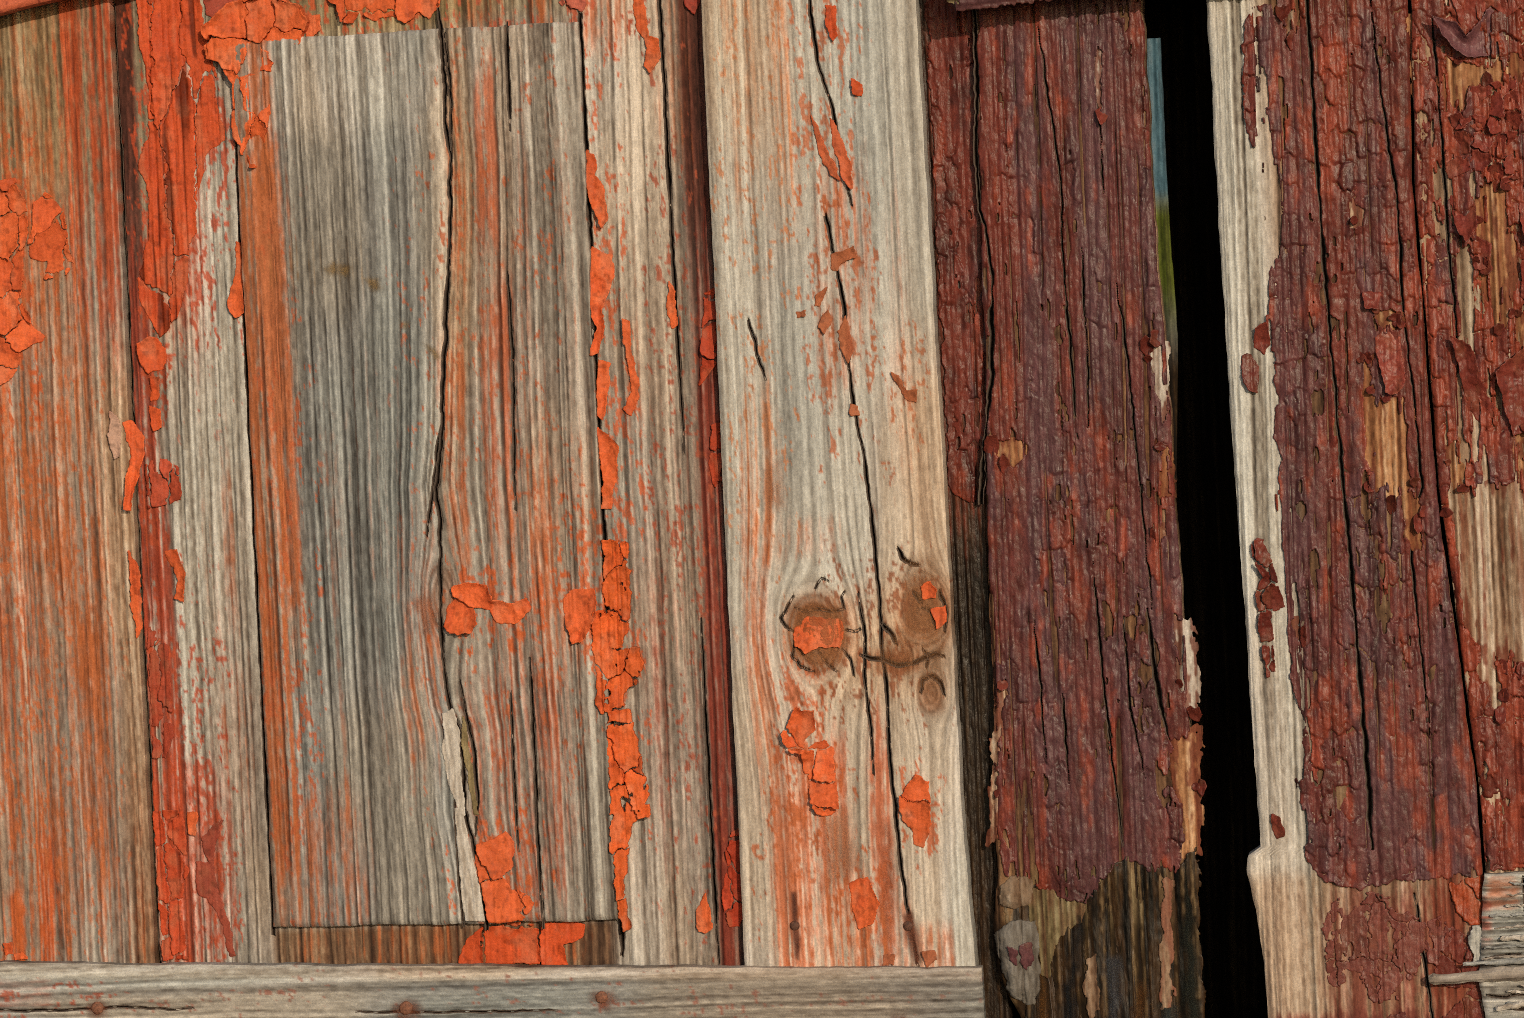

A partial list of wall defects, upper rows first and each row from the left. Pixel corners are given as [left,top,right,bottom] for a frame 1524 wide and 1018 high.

peeling [0,177,75,385]
peeling [107,0,440,511]
crack [426,7,545,931]
peeling [458,831,585,965]
peeling [563,539,651,932]
crack [808,0,838,130]
crack [823,185,852,326]
crack [779,362,948,967]
crack [972,9,995,505]
crack [1033,27,1170,848]
peeling [1167,615,1207,859]
peeling [1356,0,1524,725]